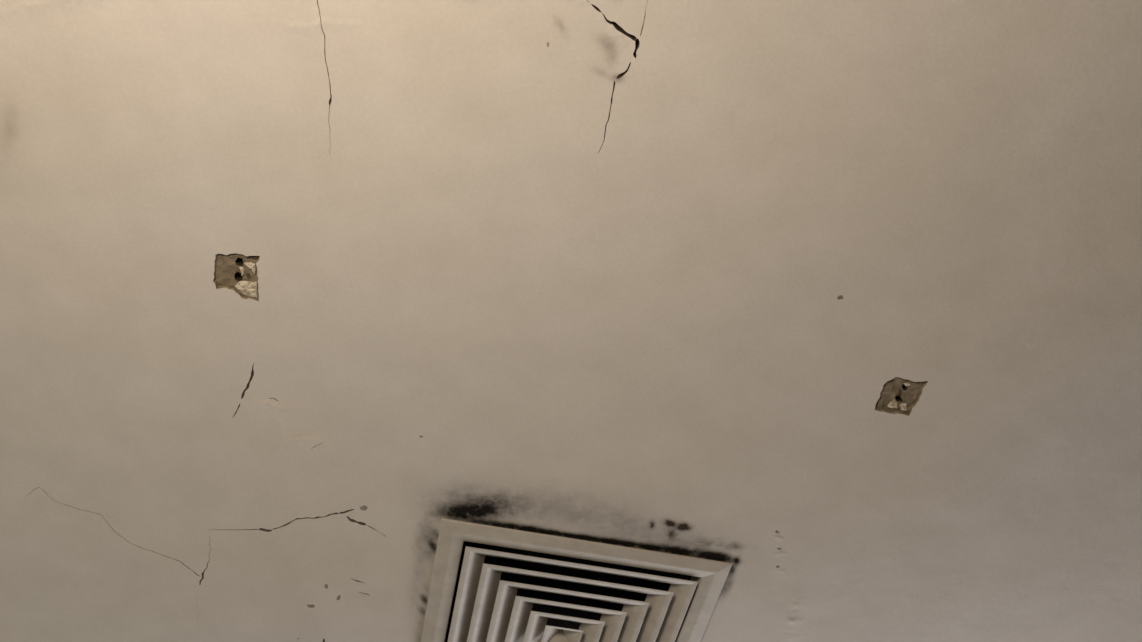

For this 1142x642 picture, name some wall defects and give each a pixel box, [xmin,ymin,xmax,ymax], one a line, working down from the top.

crack [284,0,383,147]
crack [560,0,769,153]
crack [218,363,254,417]
crack [212,505,386,537]
leakage [445,500,739,574]